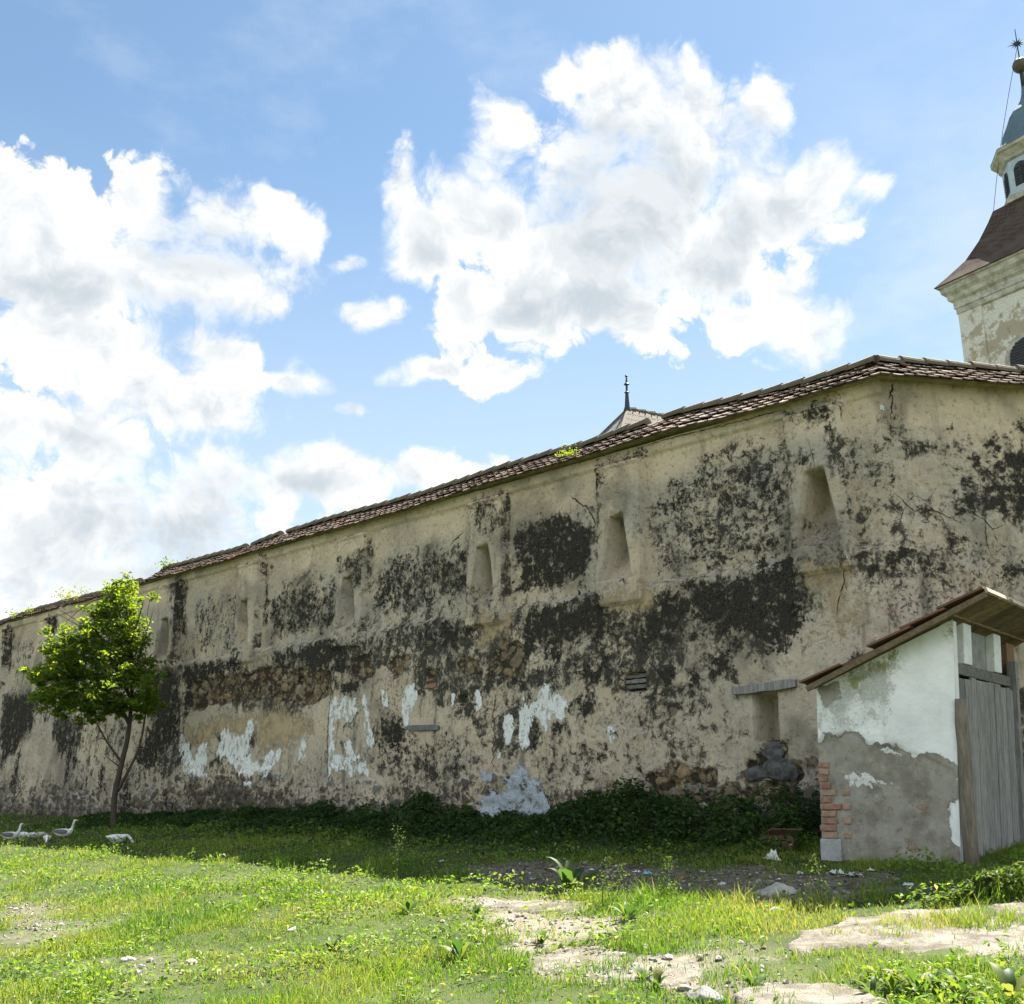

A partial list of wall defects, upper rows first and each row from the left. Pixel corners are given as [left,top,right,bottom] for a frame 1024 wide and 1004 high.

crack [896,489,1006,563]
crack [835,543,847,618]
flaking render [179,609,568,788]
peeling [818,681,841,708]
peeling [818,731,961,864]